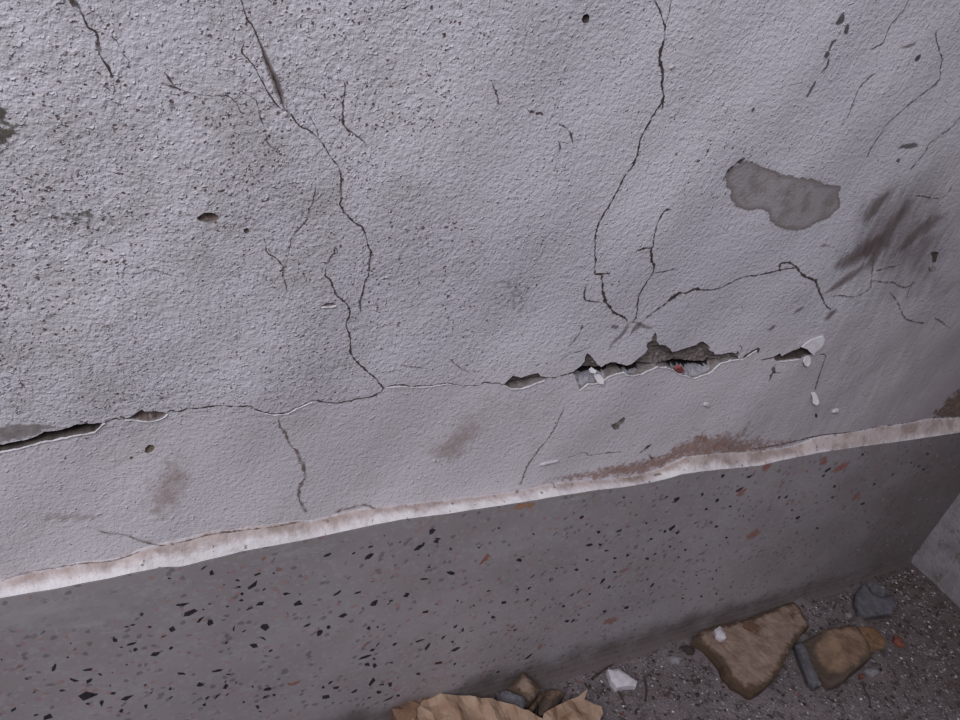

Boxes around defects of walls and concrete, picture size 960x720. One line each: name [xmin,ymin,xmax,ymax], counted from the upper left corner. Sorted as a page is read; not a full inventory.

crack [527,109,573,150]
crack [583,1,946,326]
damp [832,210,904,289]
crack [5,0,502,579]
spalling [504,373,551,390]
spalling [571,333,740,391]
crack [741,347,776,379]
spalling [773,336,825,367]
crack [811,354,826,405]
spalling [0,423,105,453]
spalling [124,410,168,423]
rust [562,428,788,482]